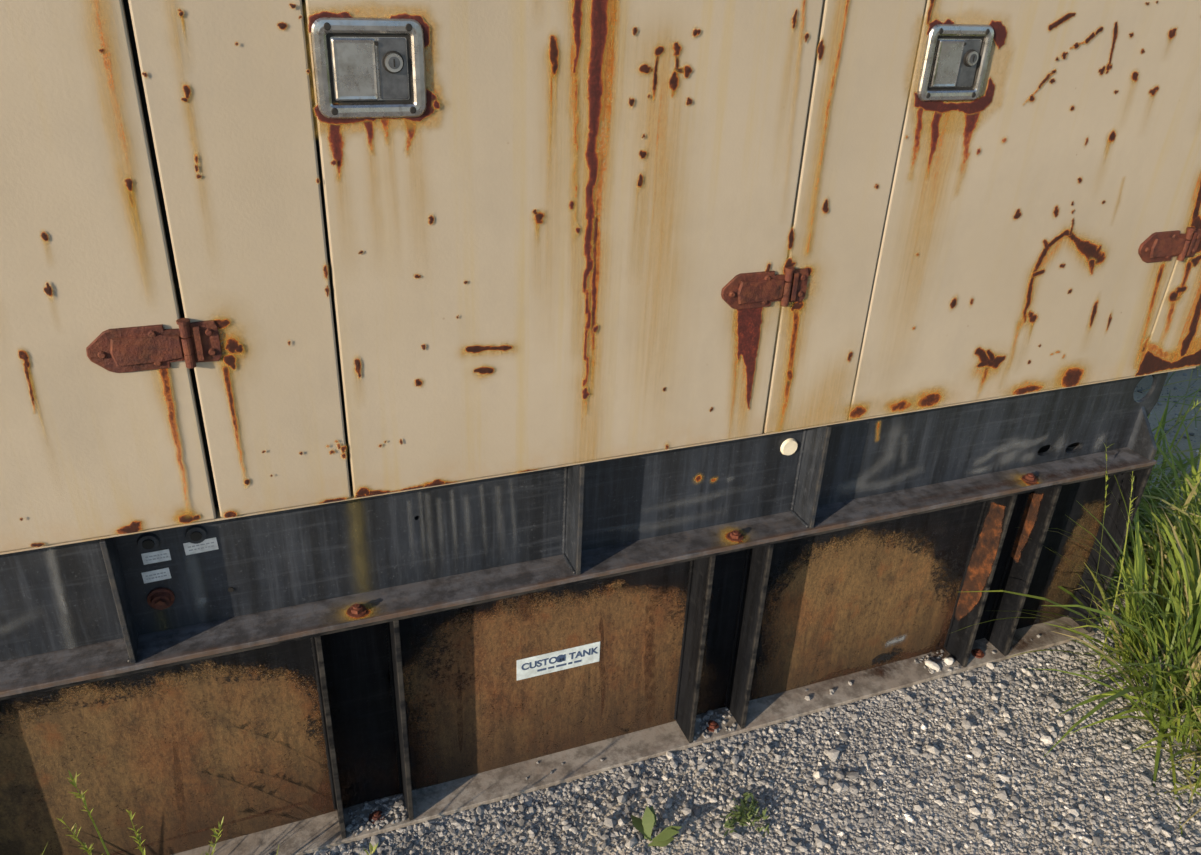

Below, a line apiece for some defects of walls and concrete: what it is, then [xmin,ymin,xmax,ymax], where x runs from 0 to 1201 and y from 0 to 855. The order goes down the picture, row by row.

corrosion [277,3,440,178]
corrosion [548,0,692,419]
corrosion [731,307,763,417]
corrosion [765,0,850,432]
corrosion [926,0,954,35]
corrosion [906,77,995,213]
corrosion [989,20,1007,49]
corrosion [1089,300,1112,331]
corrosion [1135,172,1201,377]
corrosion [159,368,200,524]
corrosion [955,475,1055,621]
corrosion [872,648,909,676]